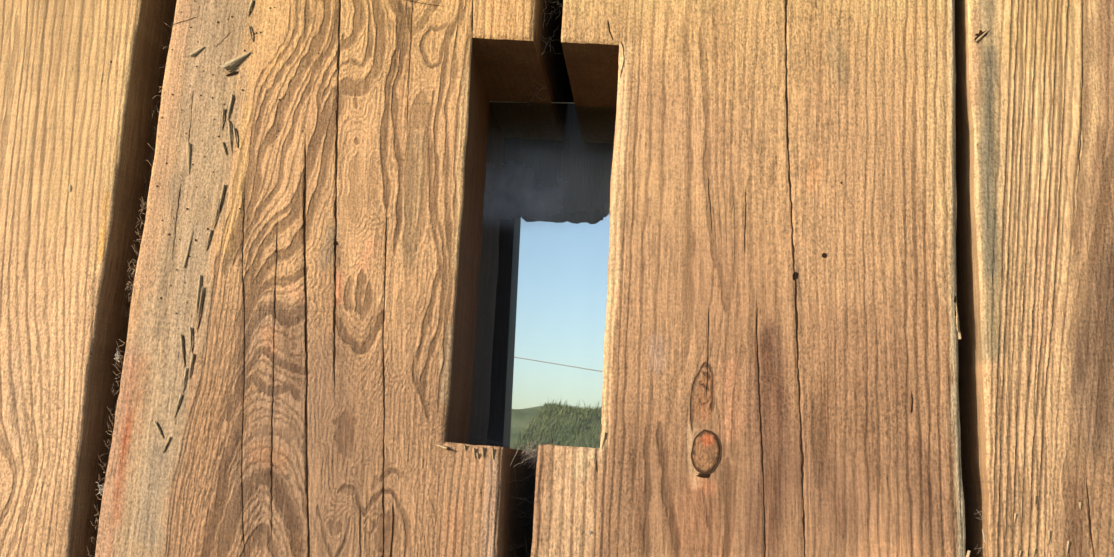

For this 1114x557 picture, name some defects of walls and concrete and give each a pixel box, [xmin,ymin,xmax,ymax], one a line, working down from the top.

crack [407,0,473,126]
crack [1078,0,1086,102]
crack [239,187,247,555]
crack [270,0,341,557]
crack [359,196,394,557]
crack [756,296,766,557]
crack [785,0,805,557]